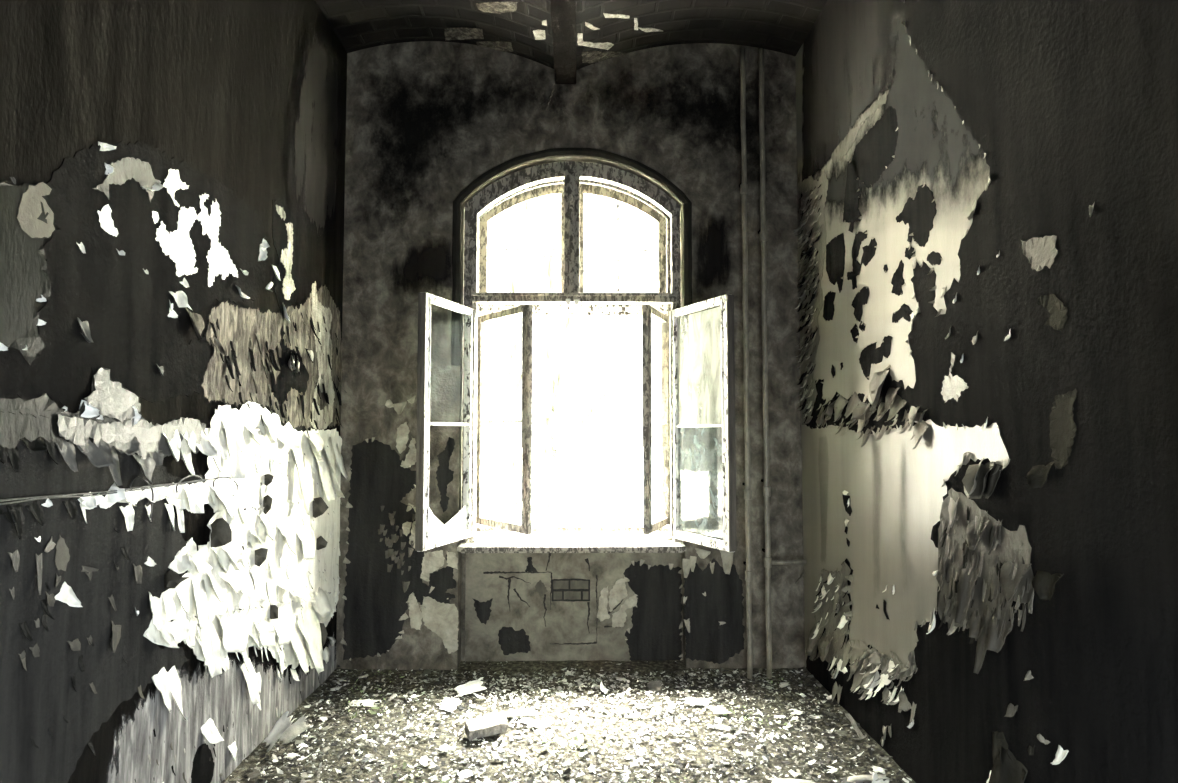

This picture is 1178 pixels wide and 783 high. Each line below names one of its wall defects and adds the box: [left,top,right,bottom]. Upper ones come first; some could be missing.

spalling [476,2,517,14]
spalling [445,27,513,52]
peeling [533,20,547,40]
peeling [577,13,662,64]
flaking render [793,0,1178,783]
flaking render [472,598,493,625]
flaking render [525,548,745,664]
flaking render [498,627,531,655]
peeling [439,677,487,713]